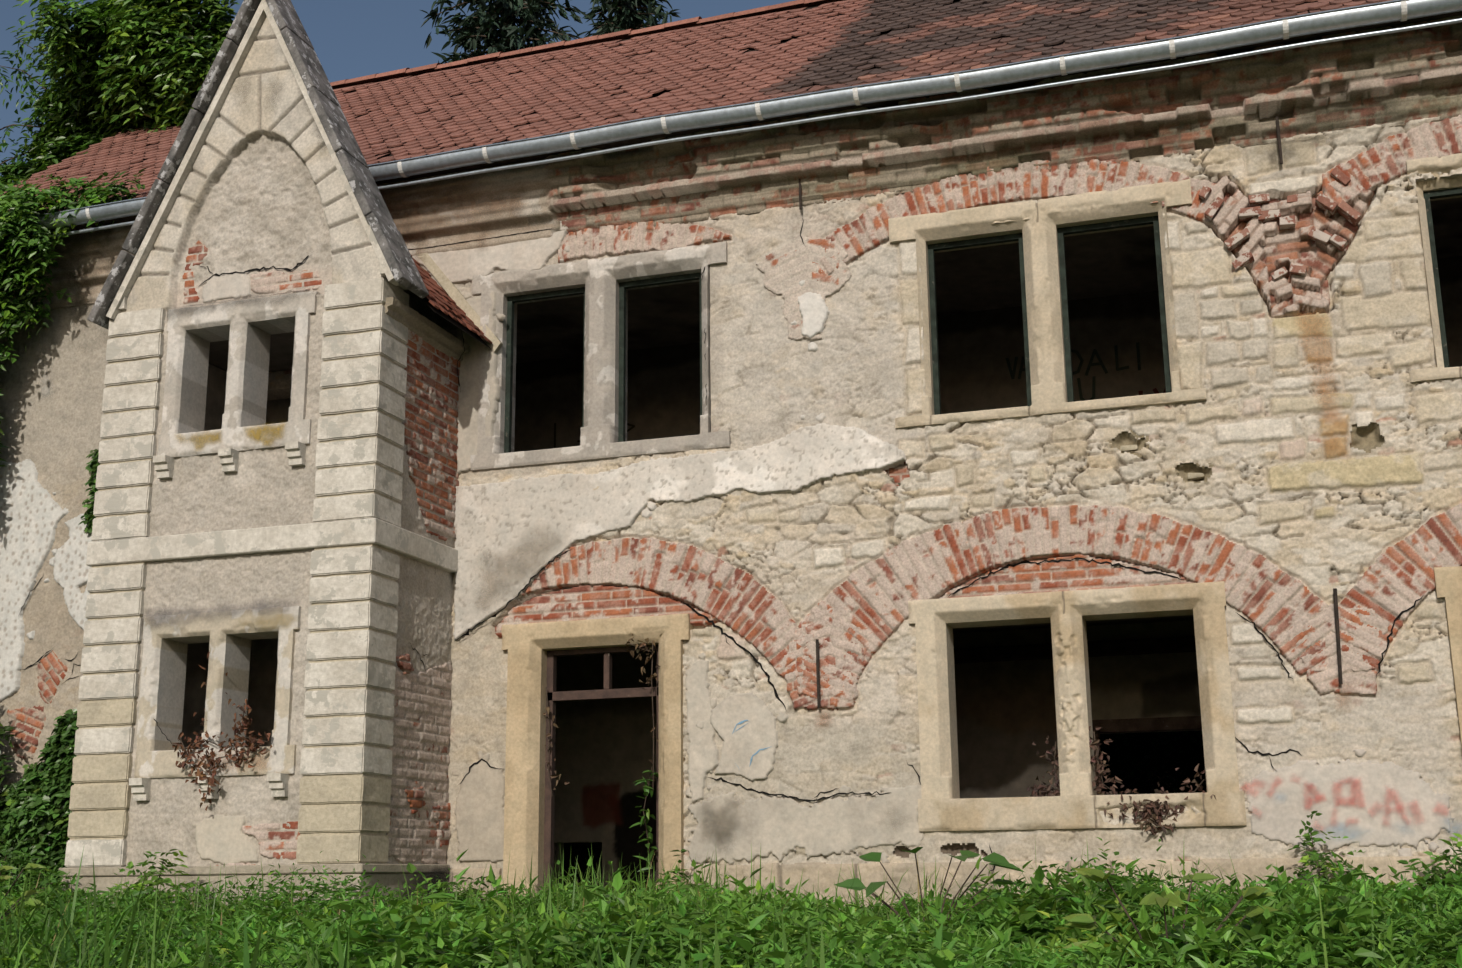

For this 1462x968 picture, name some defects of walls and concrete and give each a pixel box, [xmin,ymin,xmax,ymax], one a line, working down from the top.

peeling [182,240,322,306]
crack [200,254,310,285]
spalling [1198,167,1375,318]
peeling [403,220,911,641]
spalling [1105,430,1151,457]
peeling [0,459,92,760]
spalling [386,653,505,864]
crack [708,763,921,802]
peeling [195,815,300,875]